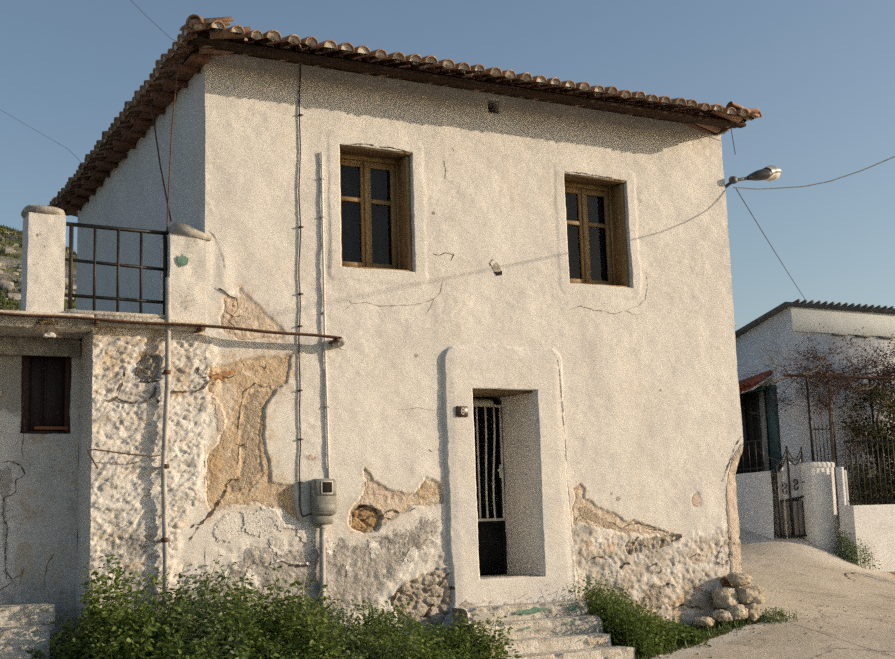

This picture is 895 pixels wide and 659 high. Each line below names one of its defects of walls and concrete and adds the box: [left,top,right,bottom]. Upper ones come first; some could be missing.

peeling [219,286,284,340]
crack [351,282,443,315]
crack [572,282,648,314]
flaking render [136,356,160,383]
crack [0,394,26,590]
peeling [194,356,492,631]
peeling [573,485,682,556]
flaking render [642,581,675,613]